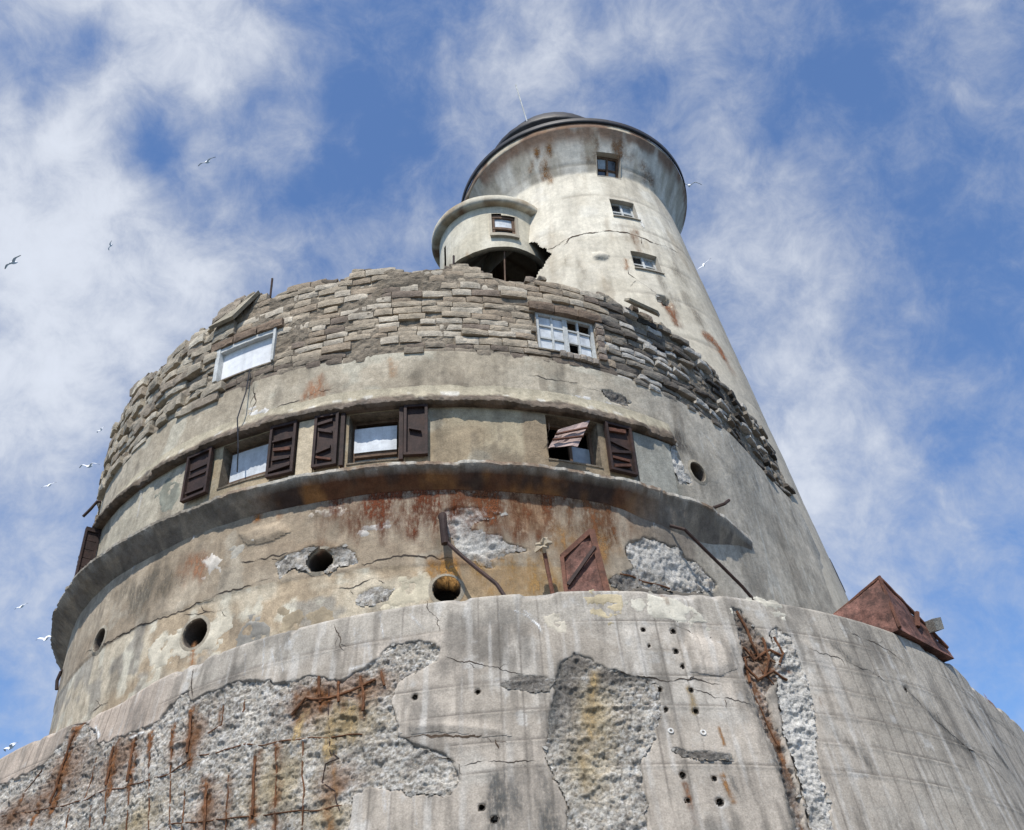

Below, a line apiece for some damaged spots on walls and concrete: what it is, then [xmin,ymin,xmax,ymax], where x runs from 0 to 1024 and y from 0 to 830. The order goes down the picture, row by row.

crack [550,230,673,250]
crack [88,553,285,651]
crack [341,554,450,594]
spalling [445,507,526,568]
corrosion [355,489,617,563]
corrosion [30,723,86,827]
corrosion [107,730,154,797]
corrosion [169,707,198,770]
spalling [0,641,460,830]
spalling [500,653,661,830]
crack [611,670,750,704]
spalling [729,596,833,830]